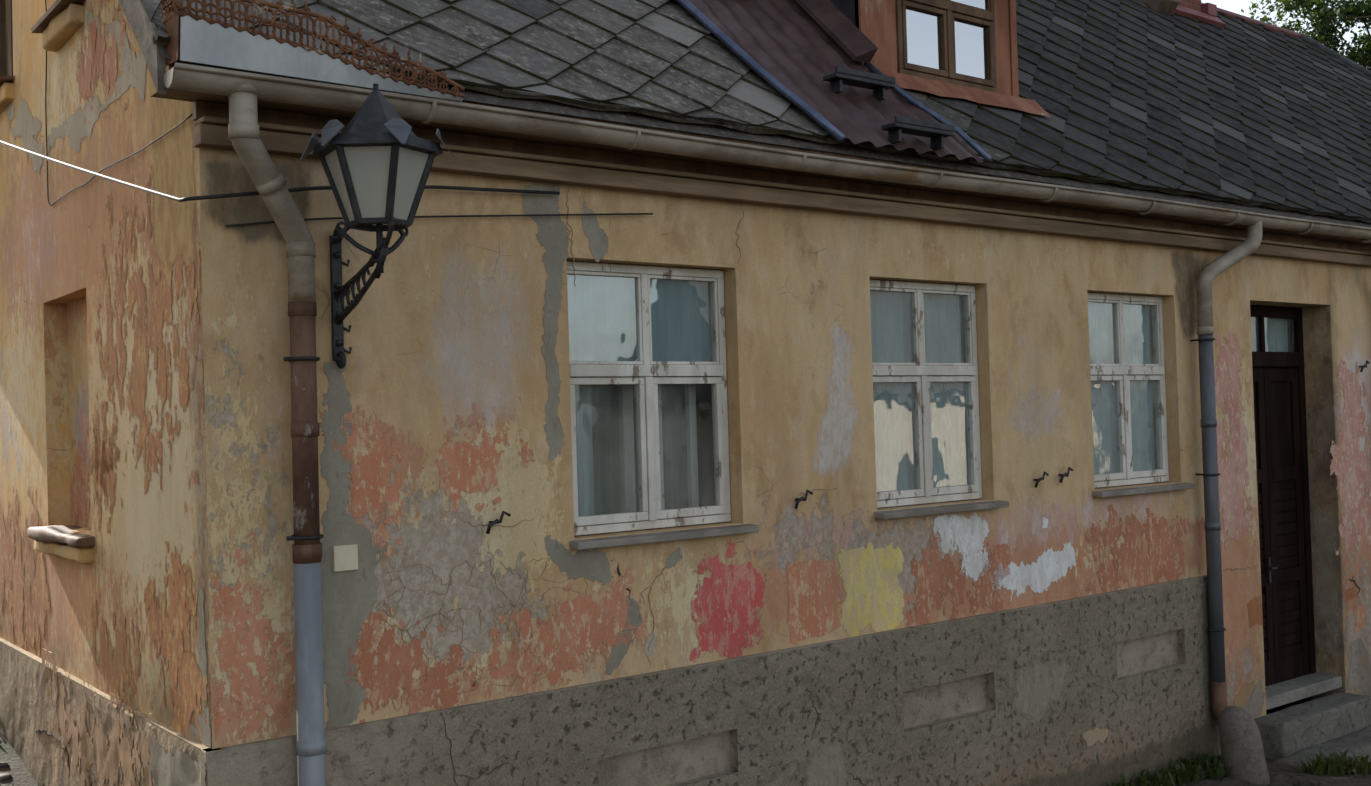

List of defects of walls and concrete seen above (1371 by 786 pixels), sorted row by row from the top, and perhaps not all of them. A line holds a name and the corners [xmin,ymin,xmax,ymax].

peeling [76,0,126,127]
peeling [70,165,205,533]
peeling [0,487,296,786]
corrosion [288,301,322,564]
peeling [320,404,411,560]
peeling [422,403,535,519]
peeling [344,569,646,723]
crack [371,519,670,786]
peeling [906,533,1017,627]
peeling [1085,505,1191,593]
peeling [1329,358,1371,561]